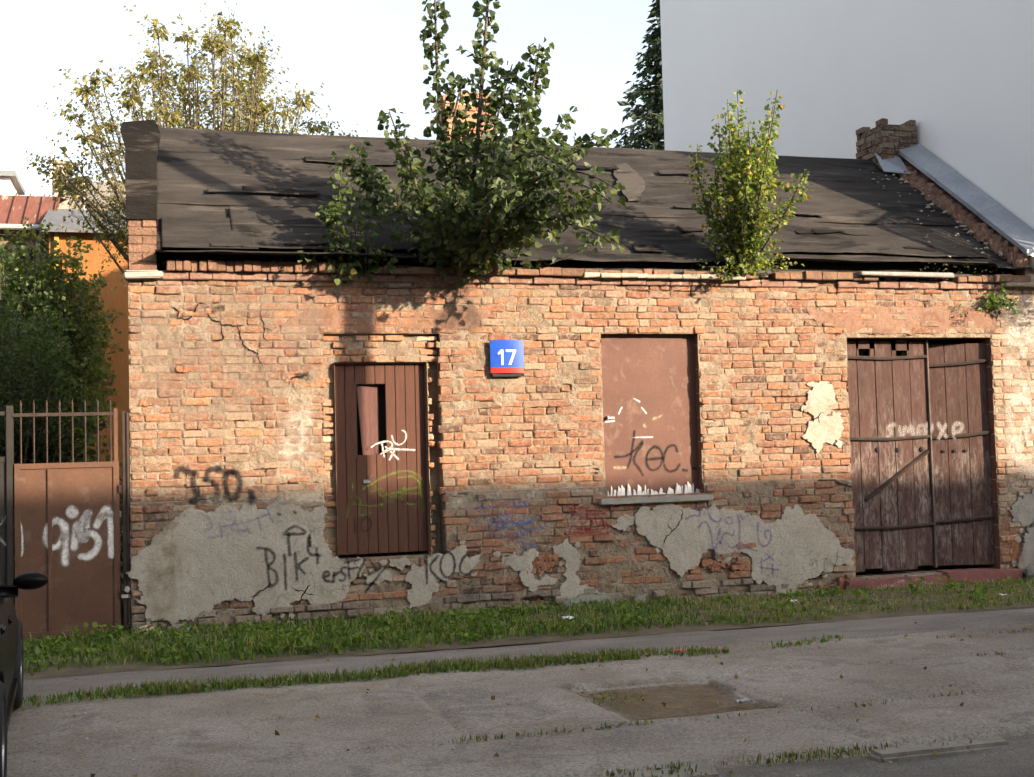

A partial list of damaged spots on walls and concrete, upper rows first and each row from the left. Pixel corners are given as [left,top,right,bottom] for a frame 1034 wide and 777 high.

crack [171,303,272,366]
flaking render [800,381,844,458]
flaking render [124,495,606,626]
flaking render [611,502,854,594]
flaking render [1006,488,1034,579]